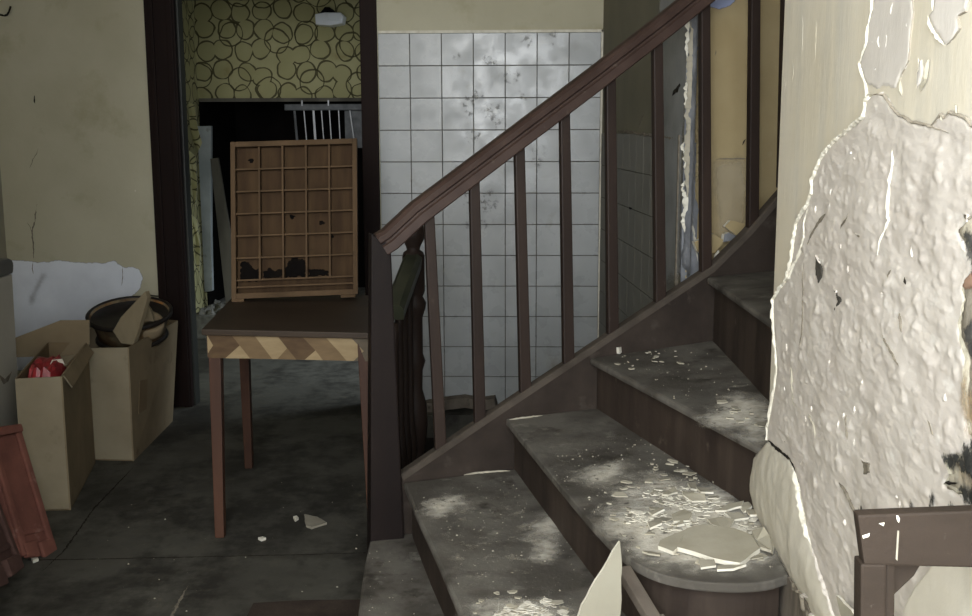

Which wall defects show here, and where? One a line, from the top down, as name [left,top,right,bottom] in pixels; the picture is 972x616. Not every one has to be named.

crack [27,205,37,258]
peeling [11,260,143,338]
peeling [717,0,972,616]
crack [768,440,804,482]